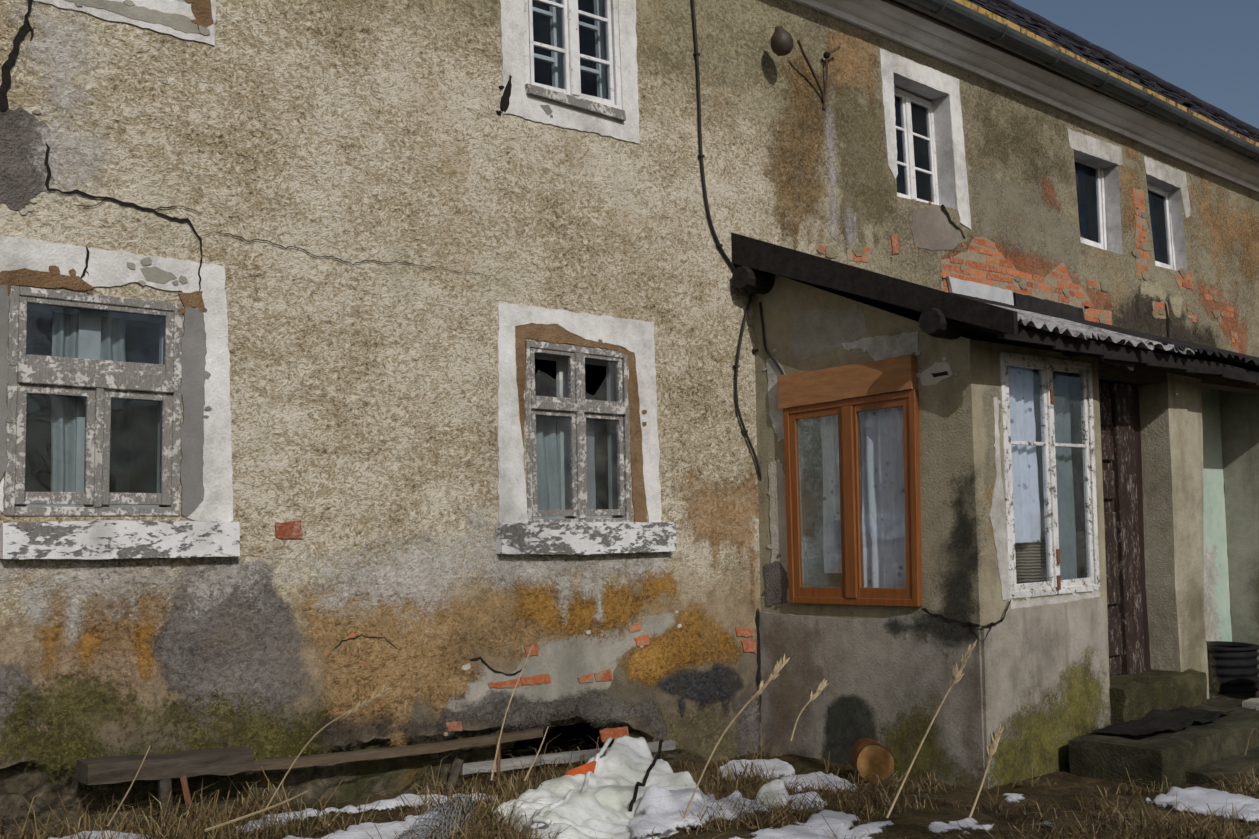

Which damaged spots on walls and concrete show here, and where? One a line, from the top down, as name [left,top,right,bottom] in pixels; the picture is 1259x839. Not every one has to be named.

crack [0,0,34,111]
spalling [0,107,60,215]
spalling [0,265,95,294]
peeling [127,257,207,314]
crack [44,143,501,291]
water stain [764,56,897,250]
flaking render [890,201,1112,325]
flaking render [1131,188,1241,353]
spalling [515,324,648,522]
water stain [886,471,984,646]
flaking render [299,569,757,746]